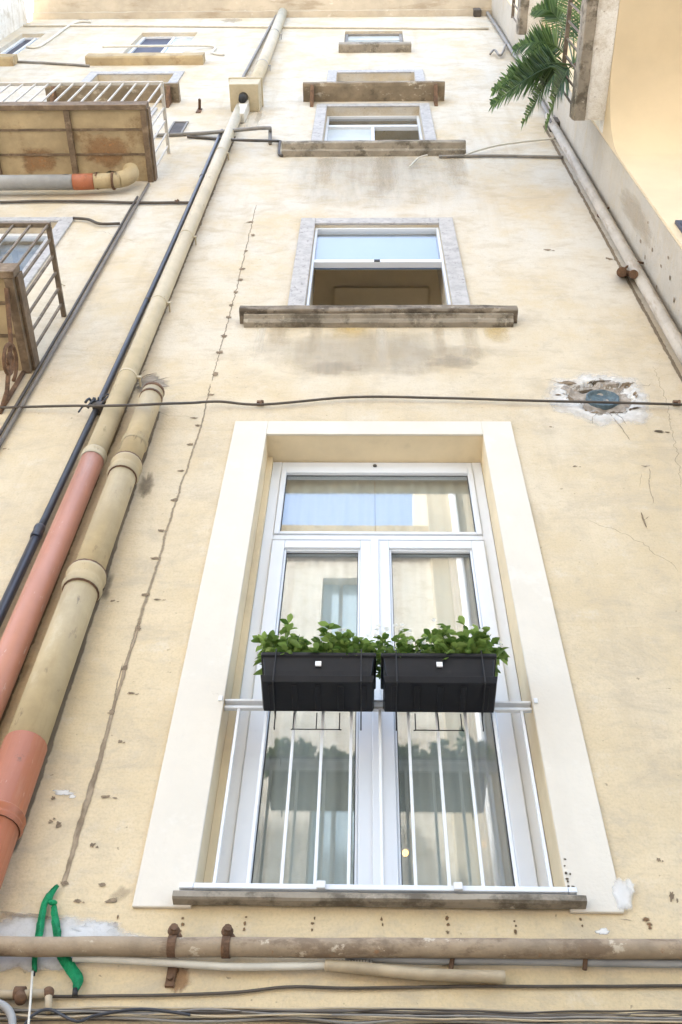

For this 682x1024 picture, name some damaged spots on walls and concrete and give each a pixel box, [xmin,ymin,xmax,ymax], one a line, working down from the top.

spalling [547,375,647,438]
peeling [613,879,634,920]